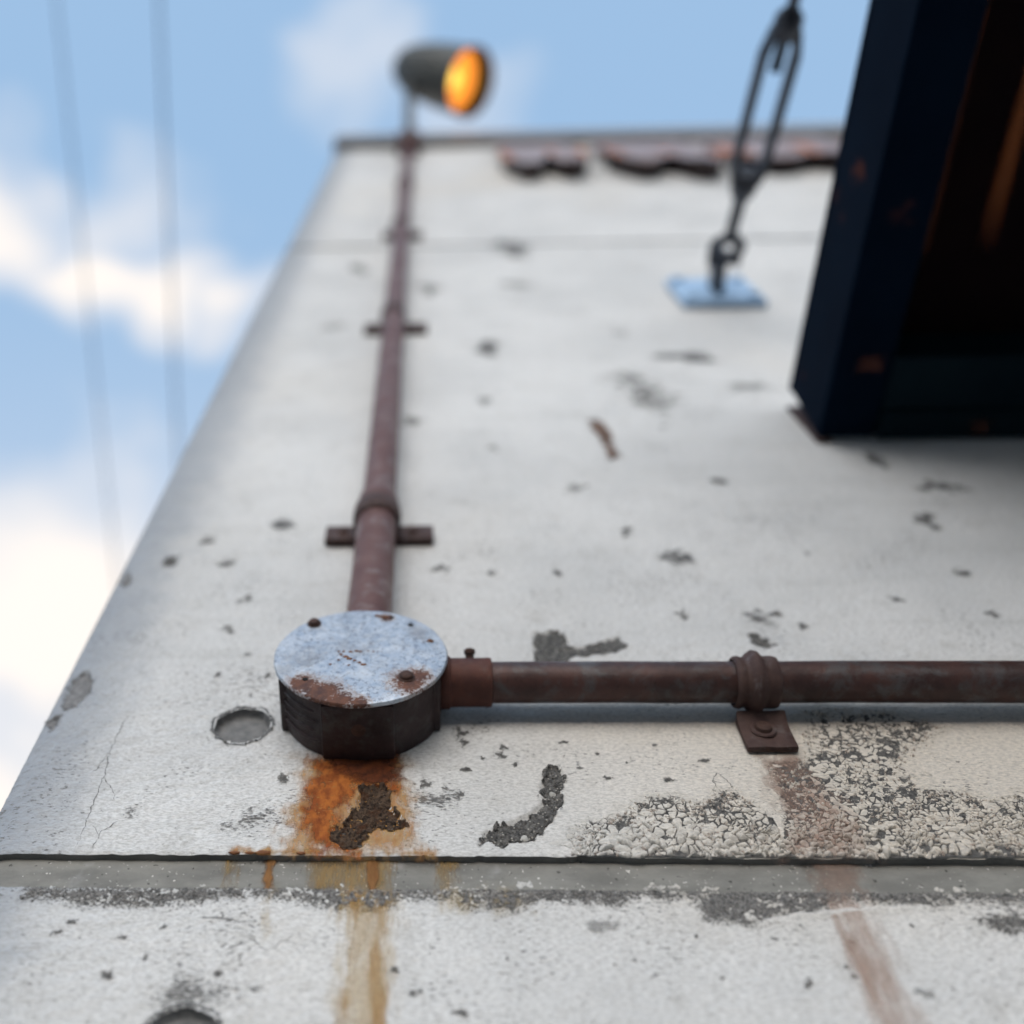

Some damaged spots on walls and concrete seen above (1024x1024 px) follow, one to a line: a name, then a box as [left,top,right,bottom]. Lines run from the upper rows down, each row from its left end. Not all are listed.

spalling [533,629,628,661]
crack [77,718,127,845]
corrosion [226,754,427,906]
spalling [329,779,468,850]
peeling [478,703,1024,860]
corrosion [371,953,384,1024]